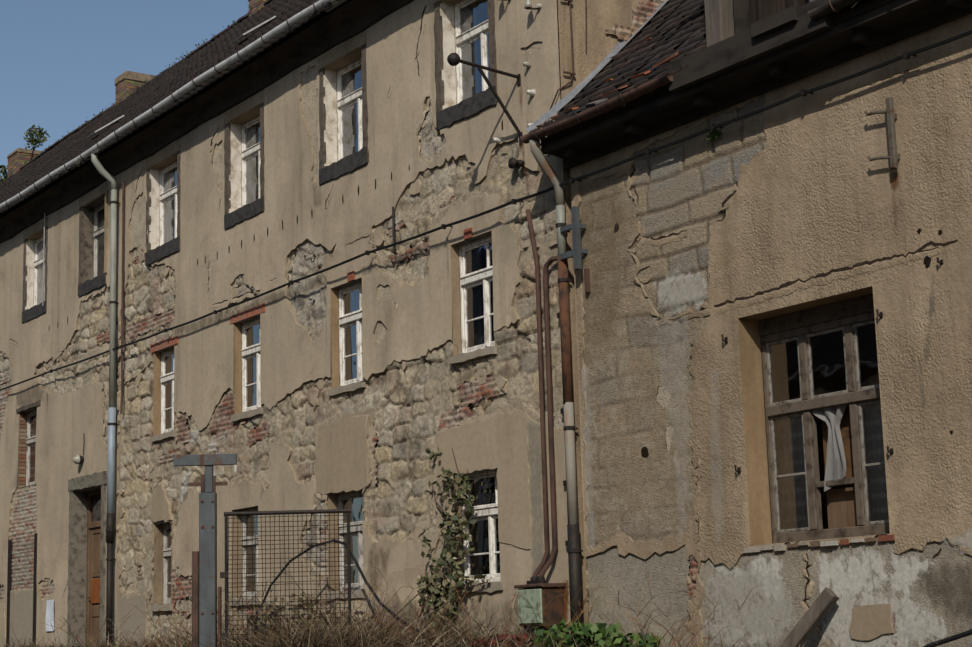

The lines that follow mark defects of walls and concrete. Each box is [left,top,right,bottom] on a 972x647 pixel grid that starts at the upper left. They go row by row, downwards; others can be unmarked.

spalling [0,351,10,440]
spalling [34,96,564,646]
spalling [578,94,972,647]
crack [655,240,958,375]
crack [691,445,703,558]